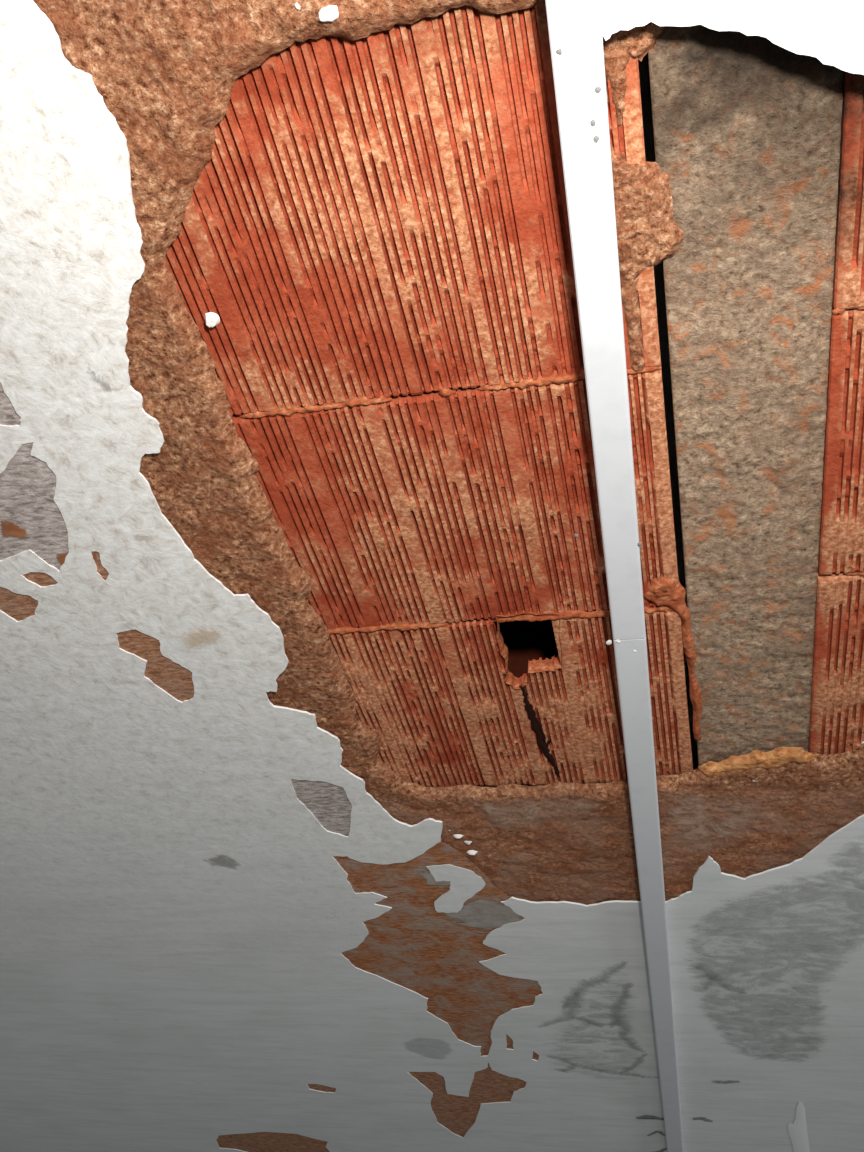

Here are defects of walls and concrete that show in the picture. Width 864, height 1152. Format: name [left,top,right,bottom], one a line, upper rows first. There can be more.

peeling [0,383,21,426]
peeling [0,442,69,621]
flaking render [33,0,641,1137]
crack [519,685,560,777]
flaking render [656,746,864,901]
damp [692,847,864,1060]
peeling [216,1132,329,1152]